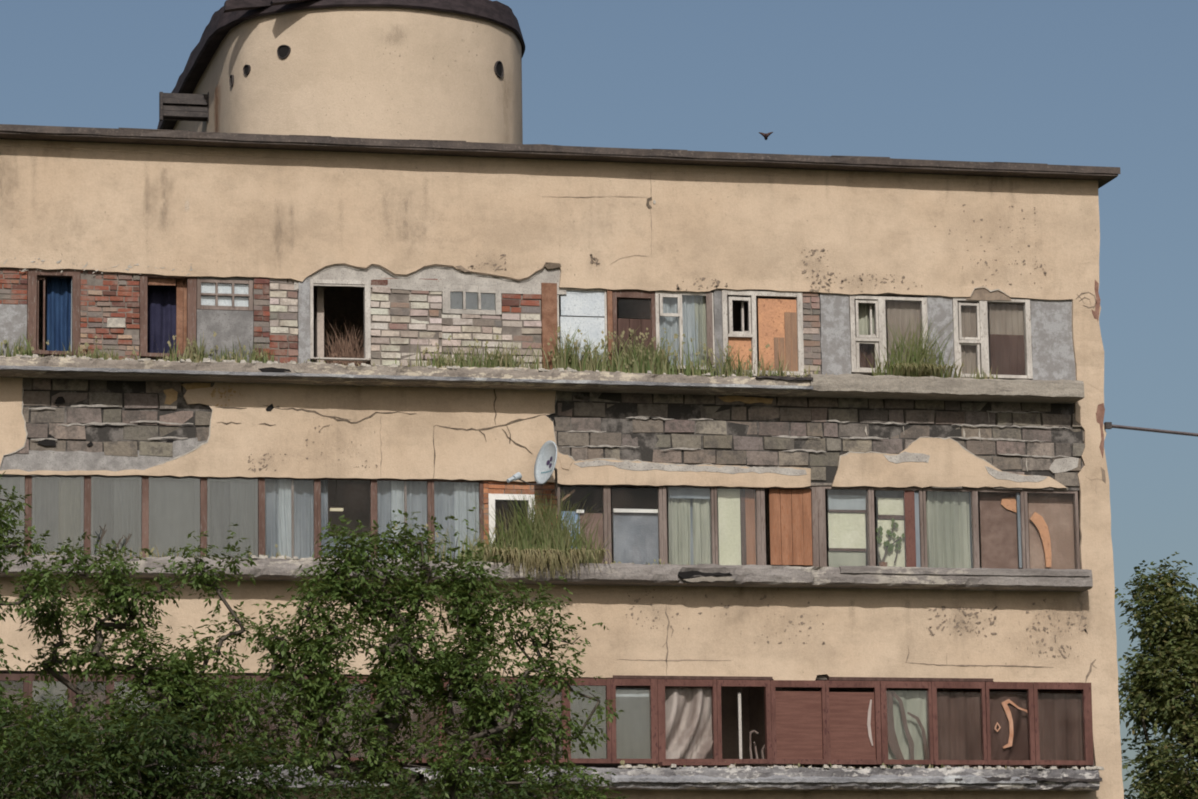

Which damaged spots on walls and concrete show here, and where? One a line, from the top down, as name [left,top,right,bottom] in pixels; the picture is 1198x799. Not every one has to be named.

flaking render [294,254,587,295]
flaking render [0,378,243,477]
crack [217,389,546,478]
flaking render [546,391,1106,491]
spalling [560,485,658,514]